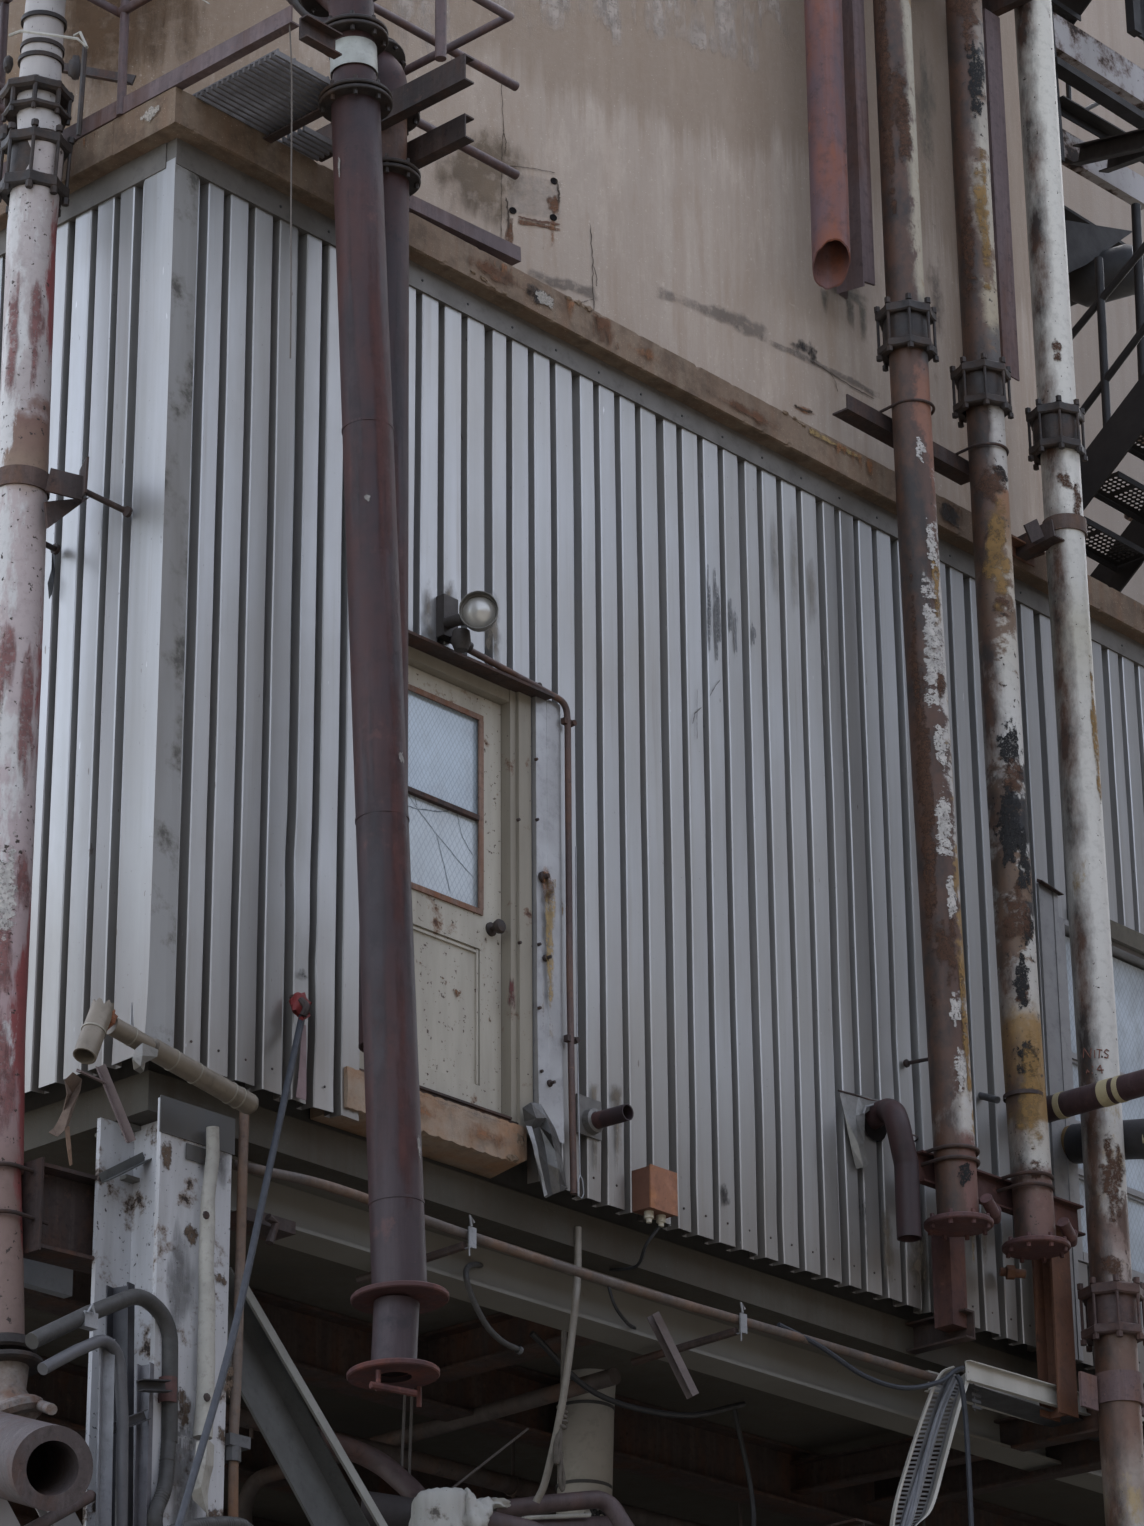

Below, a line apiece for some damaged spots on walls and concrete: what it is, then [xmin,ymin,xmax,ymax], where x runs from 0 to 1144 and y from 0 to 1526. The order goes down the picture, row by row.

leakage [702,307,873,395]
rust [543,869,563,1002]